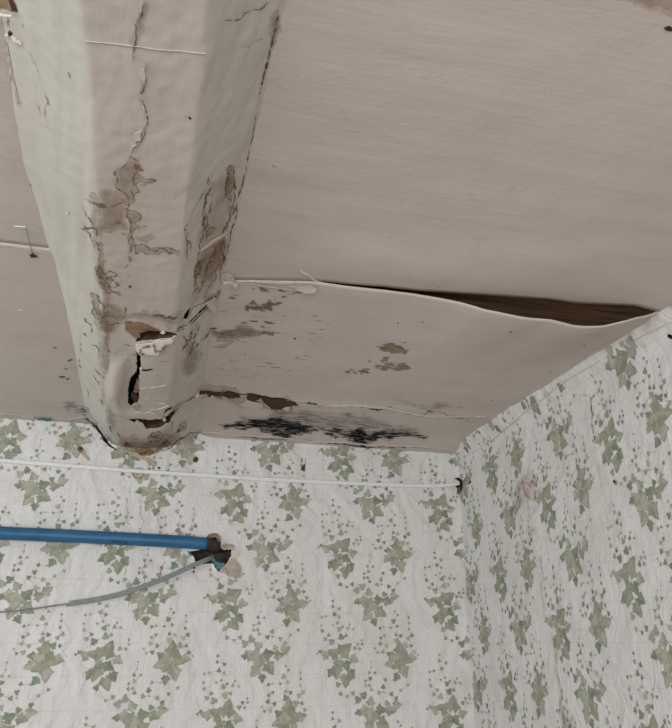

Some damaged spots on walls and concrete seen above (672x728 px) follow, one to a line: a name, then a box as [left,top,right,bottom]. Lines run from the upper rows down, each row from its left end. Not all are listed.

crack [226,3,278,95]
crack [131,1,148,151]
peeling [221,270,317,324]
peeling [125,321,166,338]
peeling [195,390,317,411]
water stain [222,411,426,449]
spalling [188,533,241,578]